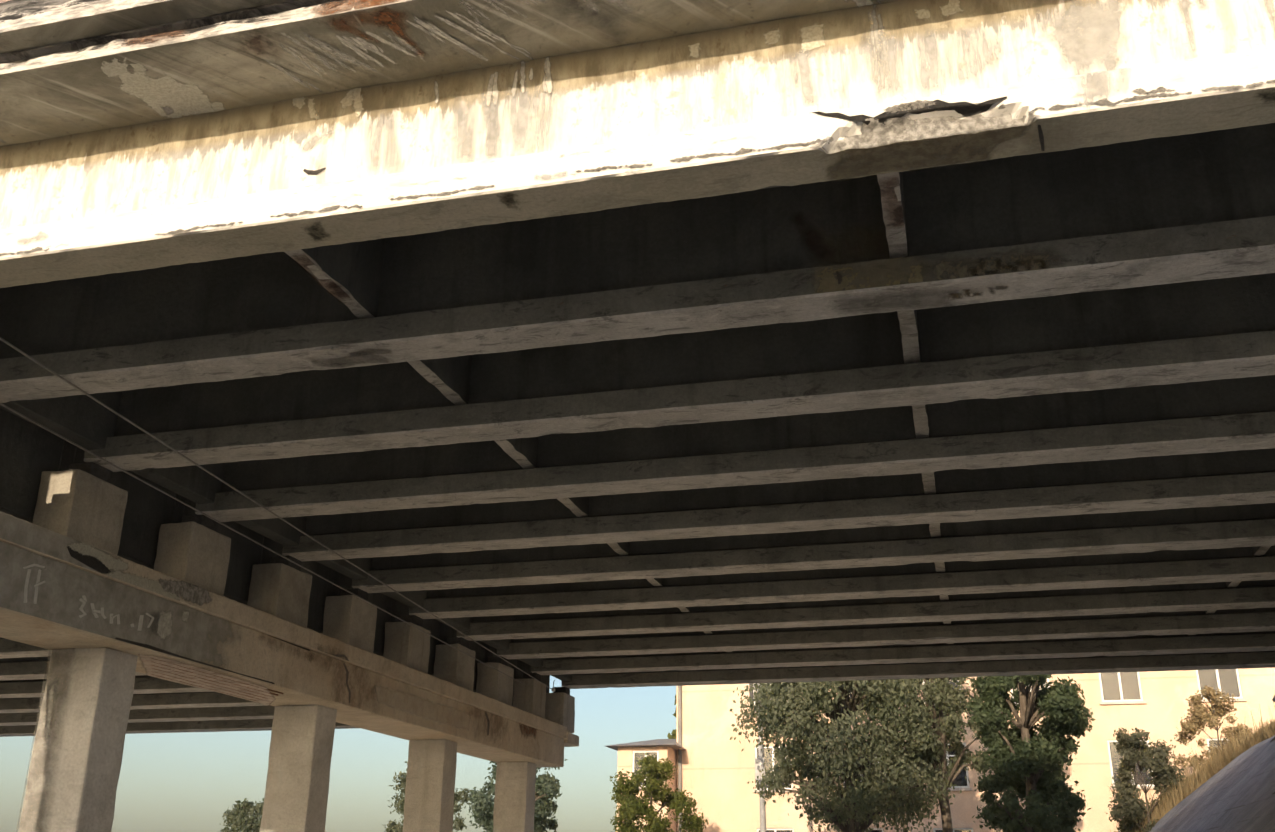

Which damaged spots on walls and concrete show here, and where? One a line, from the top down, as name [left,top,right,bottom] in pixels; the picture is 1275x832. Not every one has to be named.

peeling [100,57,225,119]
damp [269,31,422,90]
corrosion [313,0,424,56]
damp [406,0,553,156]
peeling [688,43,701,58]
peeling [799,23,826,53]
peeling [914,0,964,20]
damp [1048,0,1121,102]
spalling [670,79,1275,180]
spalling [536,164,653,180]
spalling [67,542,212,606]